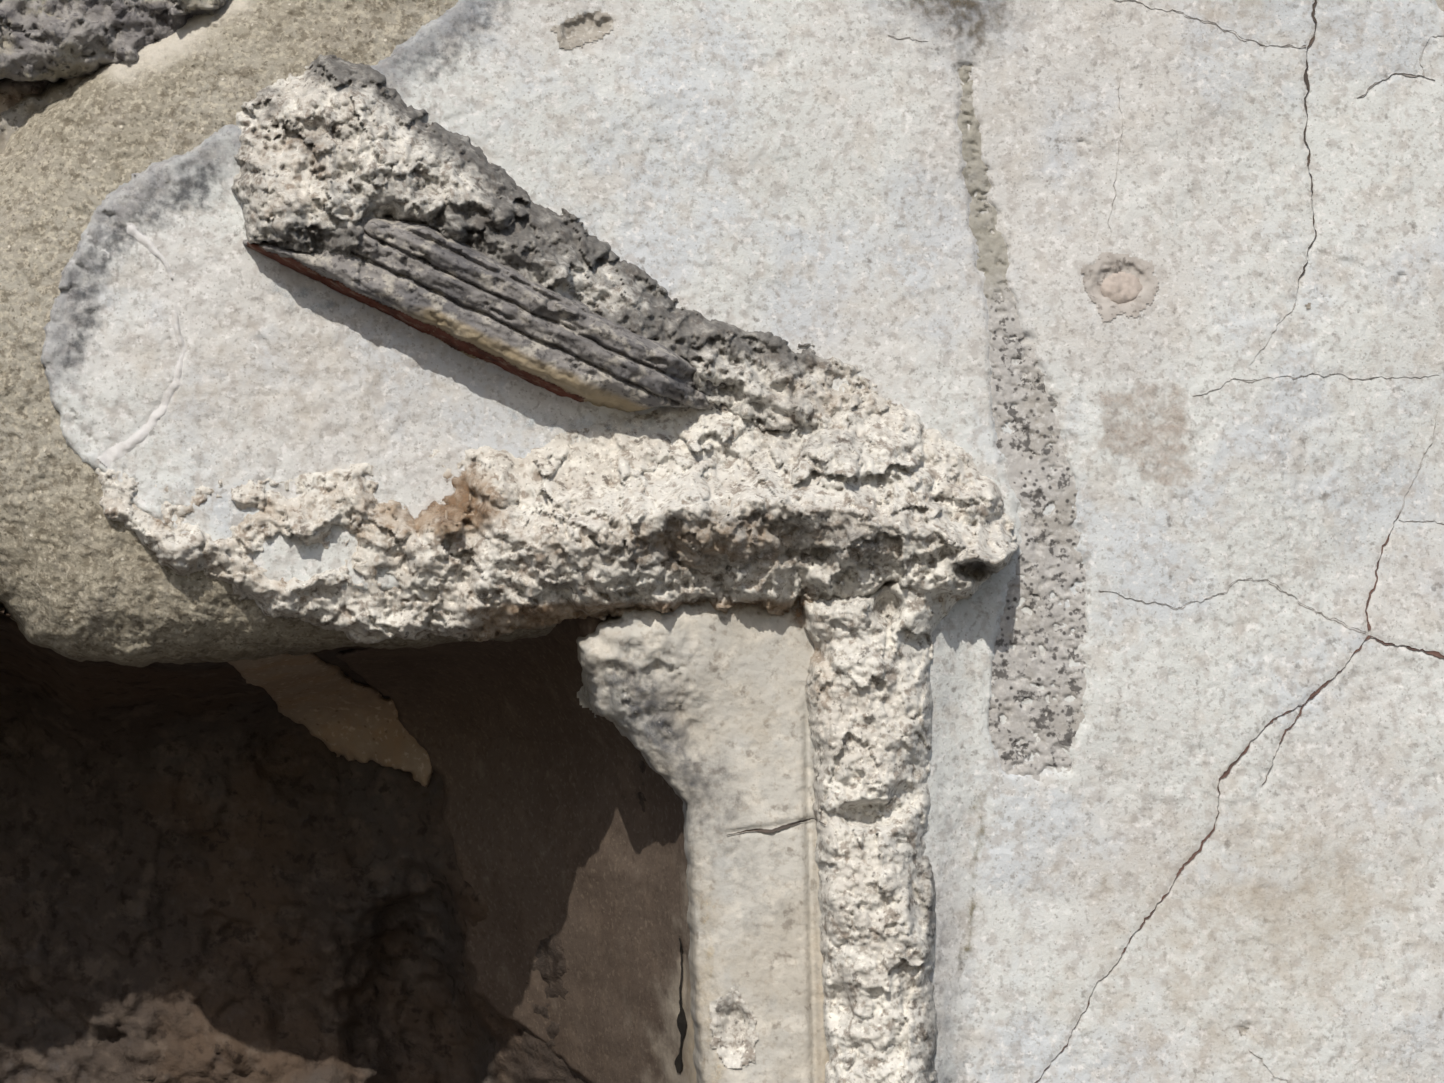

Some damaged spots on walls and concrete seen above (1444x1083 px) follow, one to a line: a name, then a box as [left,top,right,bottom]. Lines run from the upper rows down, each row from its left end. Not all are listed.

crack [1114,0,1440,396]
crack [1035,423,1444,1083]